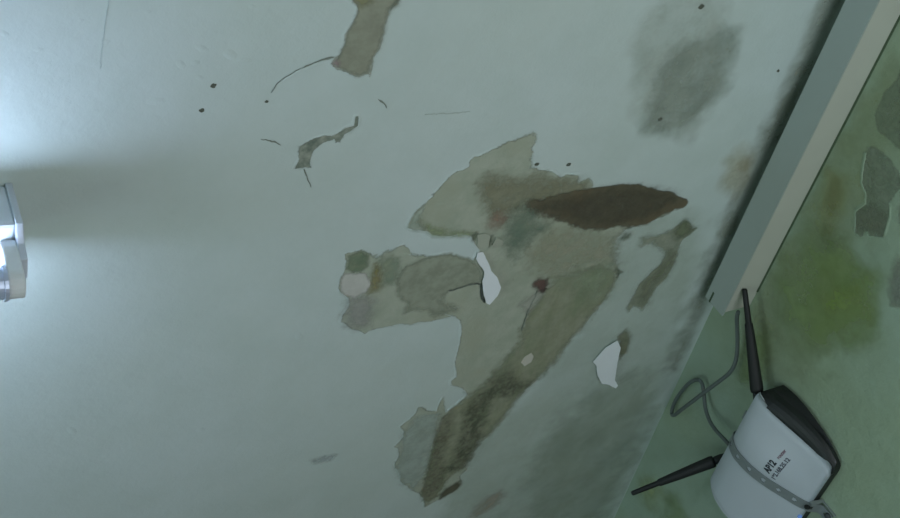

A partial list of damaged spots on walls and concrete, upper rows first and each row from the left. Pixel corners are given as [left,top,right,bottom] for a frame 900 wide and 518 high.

crack [271,57,338,94]
peeling [328,0,401,79]
peeling [292,113,362,187]
damp [528,184,688,230]
peeling [336,133,688,507]